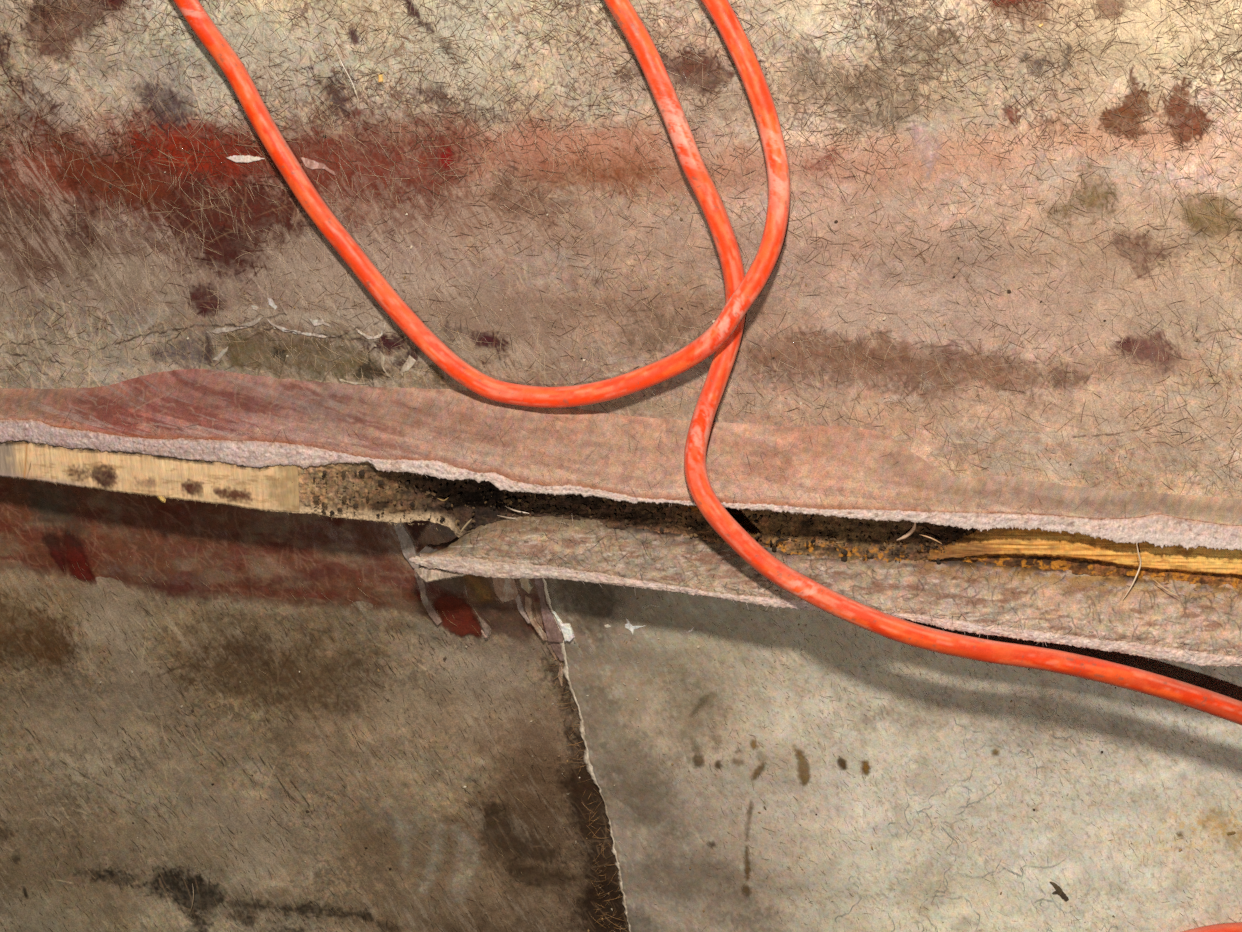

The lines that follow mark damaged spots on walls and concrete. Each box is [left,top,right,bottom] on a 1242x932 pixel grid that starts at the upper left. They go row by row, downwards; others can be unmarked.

peeling [205,298,337,361]
peeling [354,317,416,378]
peeling [393,521,575,687]
damp [676,692,740,768]
damp [545,658,655,932]
damp [795,749,810,785]
damp [92,866,398,932]
damp [420,803,569,894]
damp [742,836,750,896]